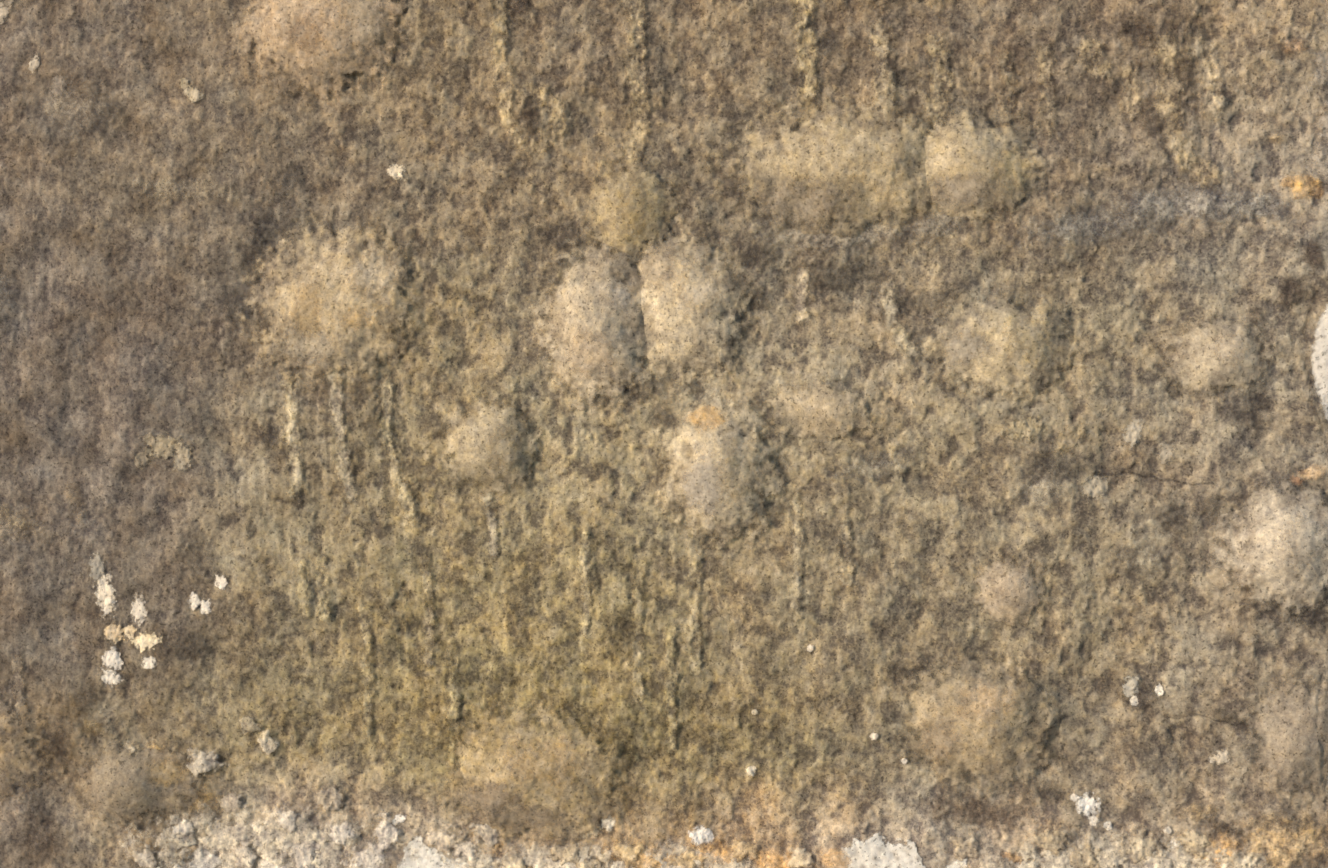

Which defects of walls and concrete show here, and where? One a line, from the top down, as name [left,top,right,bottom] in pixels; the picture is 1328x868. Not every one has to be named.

peeling [179,78,203,103]
peeling [387,164,405,180]
peeling [1311,305,1328,420]
peeling [134,432,192,471]
peeling [1080,475,1108,499]
peeling [189,575,228,614]
peeling [1122,676,1140,706]
peeling [1209,750,1231,765]
peeling [1070,792,1112,831]
peeling [397,836,493,868]
peeling [688,826,714,846]
peeling [841,833,968,868]